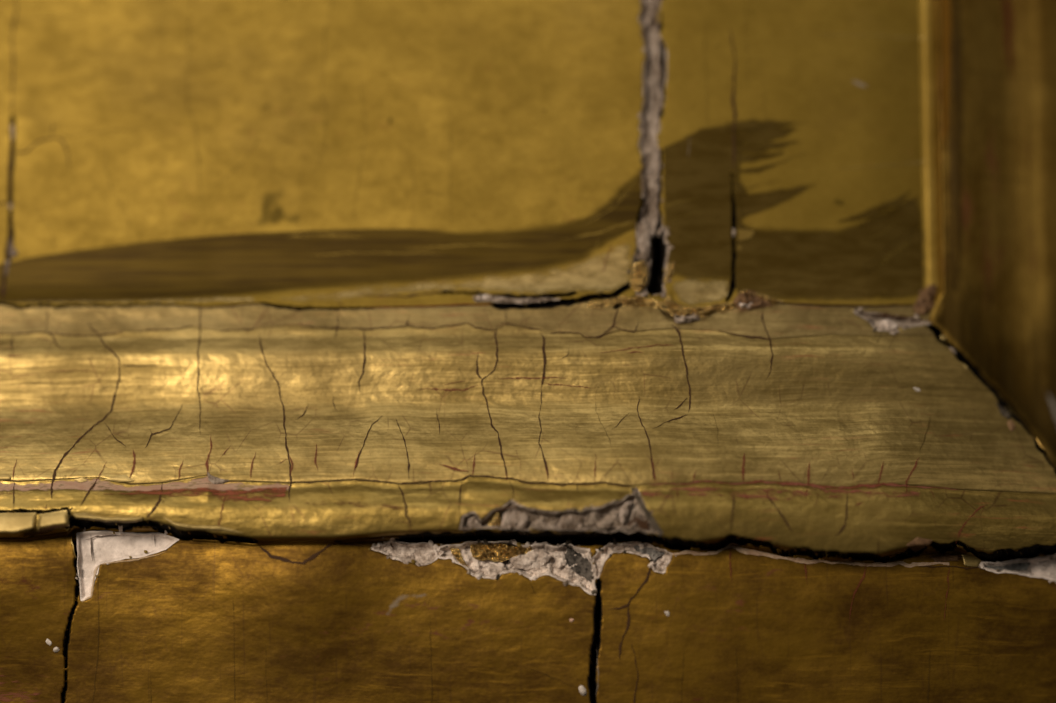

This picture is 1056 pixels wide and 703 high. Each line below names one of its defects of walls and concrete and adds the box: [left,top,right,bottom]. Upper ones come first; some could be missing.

crack [0,1,184,498]
crack [138,0,1056,620]
spalling [851,307,932,335]
spalling [75,526,179,601]
crack [62,478,360,703]
spalling [369,487,676,595]
crack [579,567,652,703]
spalling [978,554,1056,583]